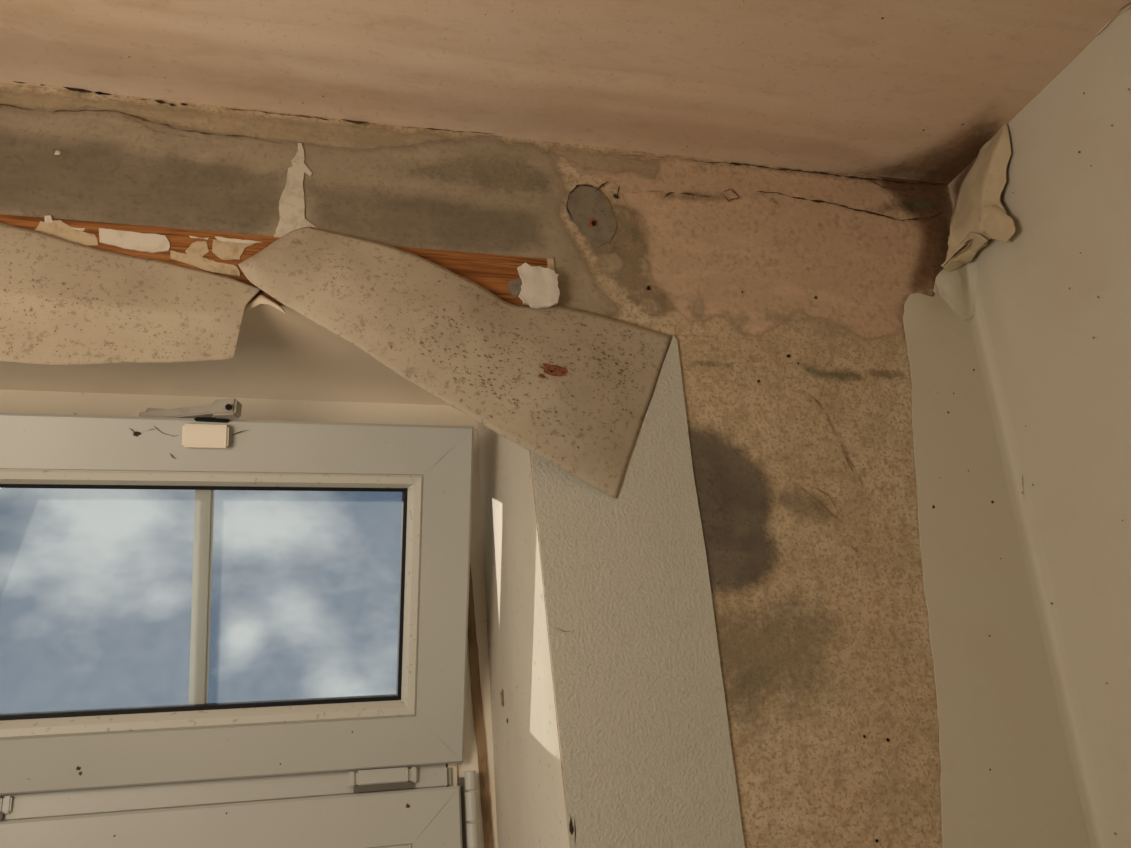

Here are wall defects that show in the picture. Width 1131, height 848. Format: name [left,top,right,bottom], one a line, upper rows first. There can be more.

damp [881,124,989,286]
rust [538,363,568,378]
damp [688,430,774,590]